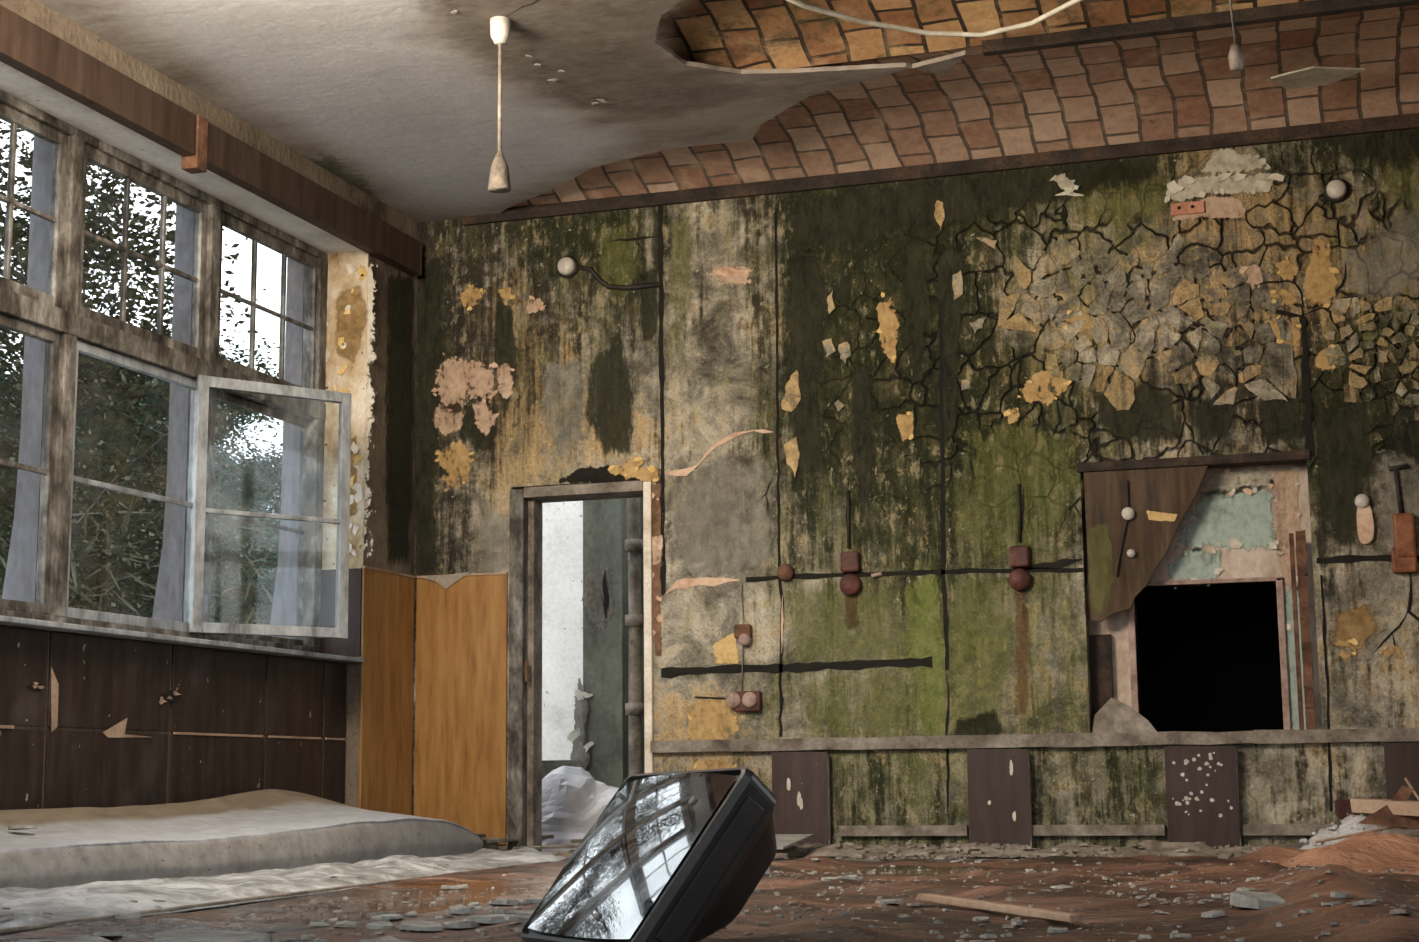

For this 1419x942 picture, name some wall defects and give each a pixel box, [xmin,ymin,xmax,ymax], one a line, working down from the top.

peeling [323,263,378,557]
water stain [385,257,445,575]
peeling [431,353,515,492]
water stain [461,301,518,453]
water stain [586,333,636,454]
water stain [778,155,1167,473]
water stain [1146,510,1177,521]
water stain [1096,382,1235,447]
crack [998,233,1419,457]
peeling [1200,465,1302,591]
water stain [1251,391,1372,545]
water stain [950,710,1003,735]